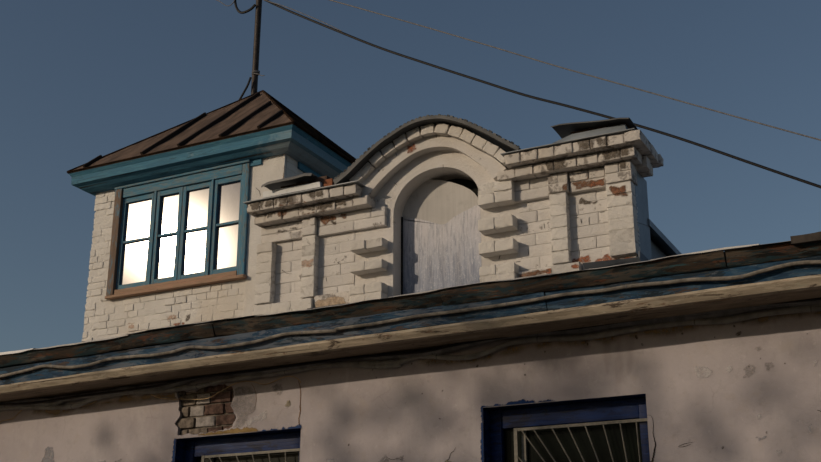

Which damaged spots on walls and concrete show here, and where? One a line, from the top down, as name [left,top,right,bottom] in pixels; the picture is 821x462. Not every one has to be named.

peeling [303,190,346,225]
peeling [554,178,628,204]
flaking render [315,297,345,307]
spalling [176,384,258,435]